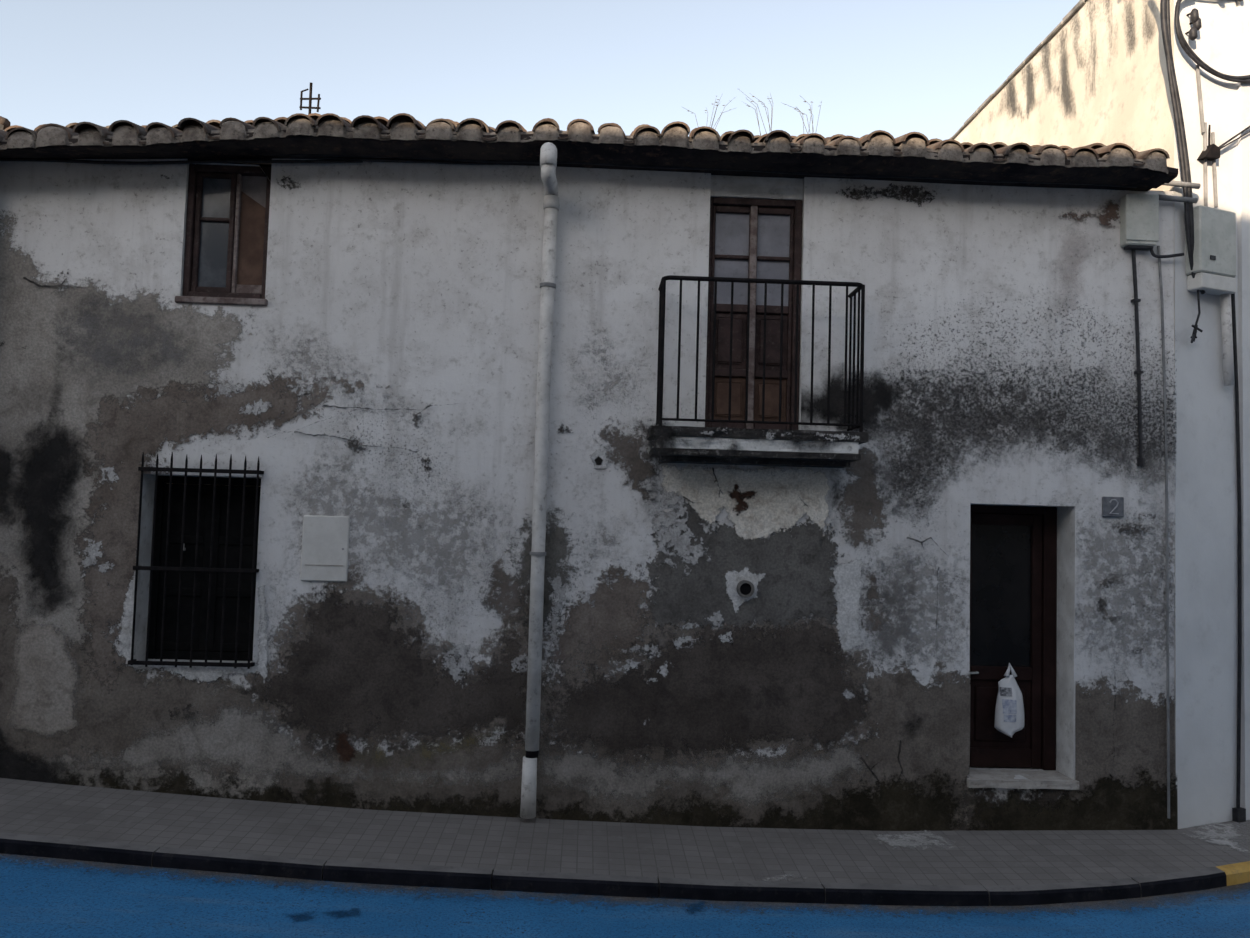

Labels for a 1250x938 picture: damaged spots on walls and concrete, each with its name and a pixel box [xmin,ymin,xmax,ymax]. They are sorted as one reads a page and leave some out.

water stain [1007,34,1096,116]
water stain [1125,4,1152,48]
water stain [788,289,1177,533]
water stain [0,397,82,616]
peeling [294,438,502,592]
peeling [652,464,830,580]
rust [729,484,757,516]
peeling [118,562,268,683]
water stain [0,508,875,806]
peeling [725,567,766,613]
peeling [832,553,967,664]
peeling [1075,514,1175,667]